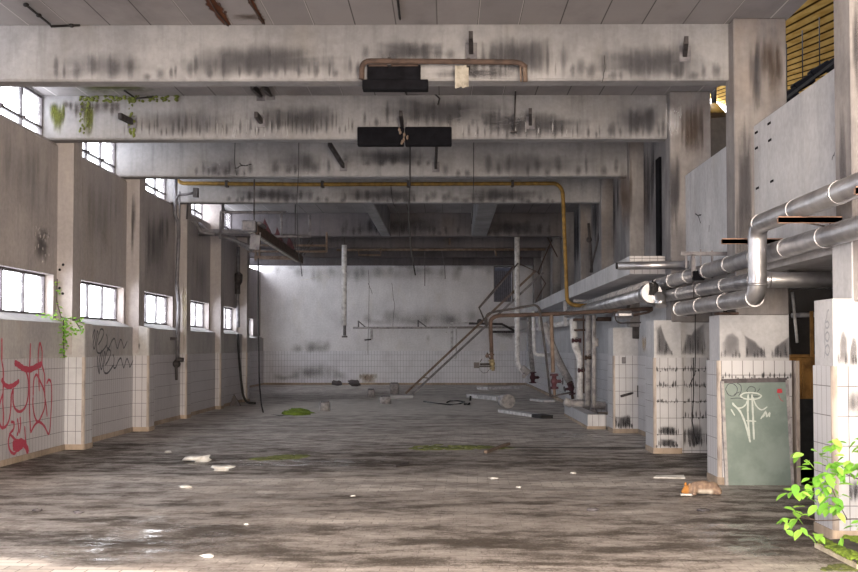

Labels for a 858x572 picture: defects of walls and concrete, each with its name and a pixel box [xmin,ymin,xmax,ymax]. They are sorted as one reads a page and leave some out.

spalling [205,0,231,27]
spalling [248,0,265,25]
leakage [221,50,300,70]
leakage [623,53,682,73]
leakage [754,52,781,95]
leakage [287,111,318,126]
leakage [411,104,470,121]
leakage [373,153,409,162]
leakage [658,330,670,352]
leakage [685,329,703,352]
leakage [747,339,791,356]
leakage [656,399,707,448]